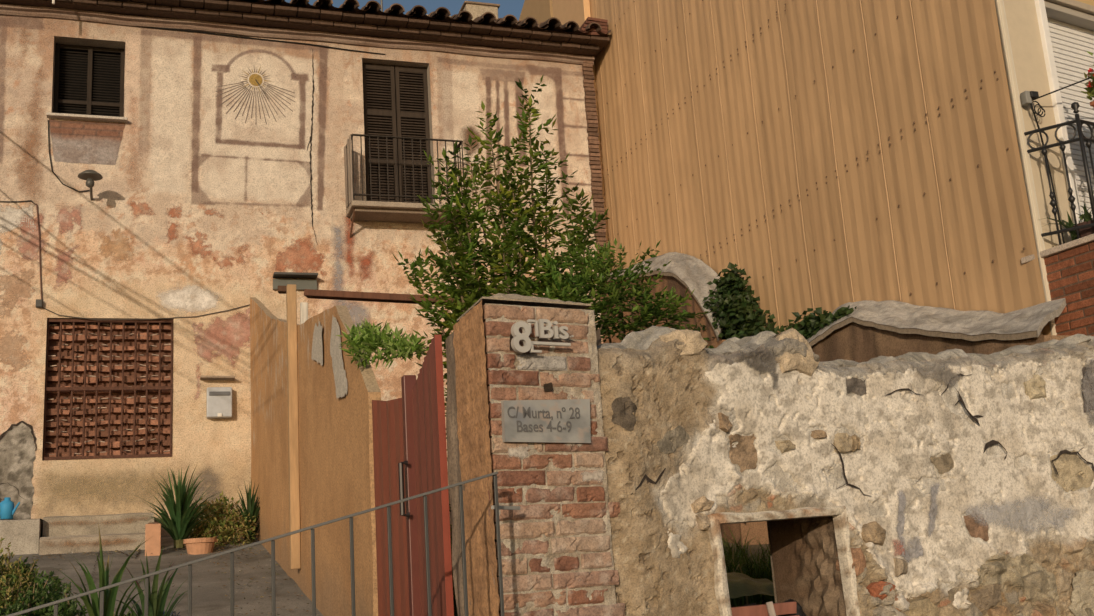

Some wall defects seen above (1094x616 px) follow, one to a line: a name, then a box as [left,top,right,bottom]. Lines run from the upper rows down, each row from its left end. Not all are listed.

spalling [0,423,36,520]
peeling [657,355,1094,613]